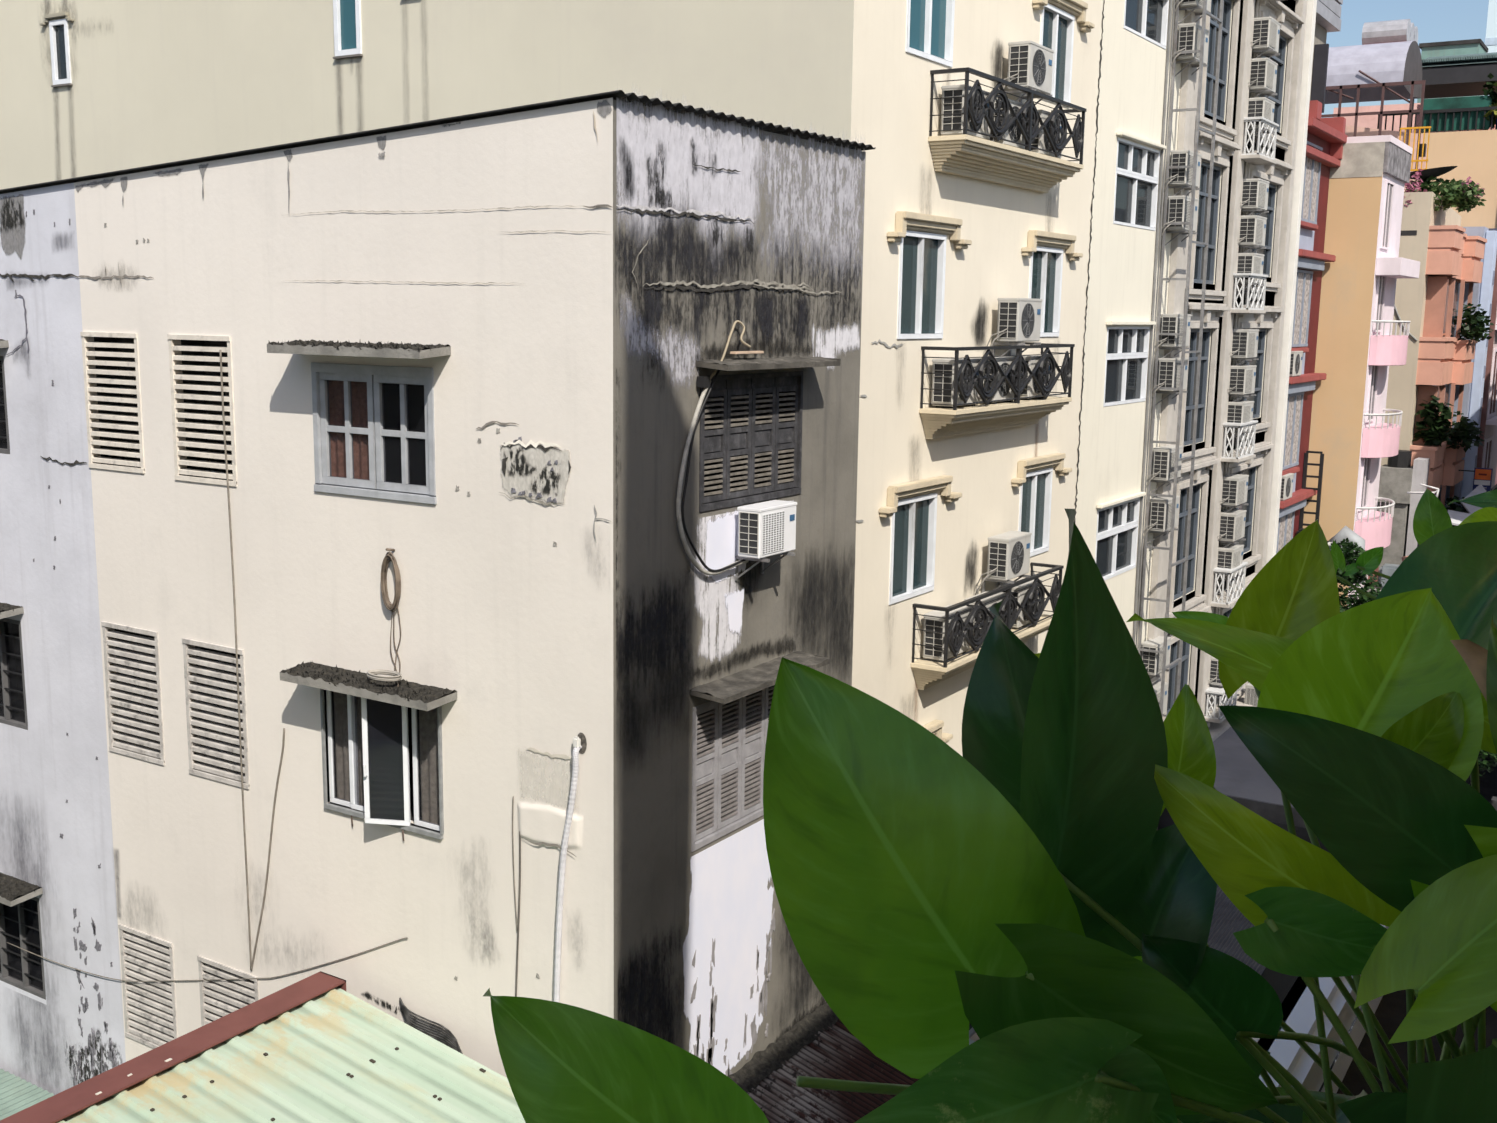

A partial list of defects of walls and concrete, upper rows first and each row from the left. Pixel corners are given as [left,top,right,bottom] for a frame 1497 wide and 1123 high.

peeling [0,195,35,259]
crack [285,204,843,295]
mould [615,145,862,368]
spalling [477,428,571,506]
damp [616,498,693,750]
peeling [704,511,746,633]
damp [740,565,761,600]
damp [797,560,853,669]
damp [618,935,679,1045]
peeling [682,819,775,1076]
damp [786,928,823,1017]